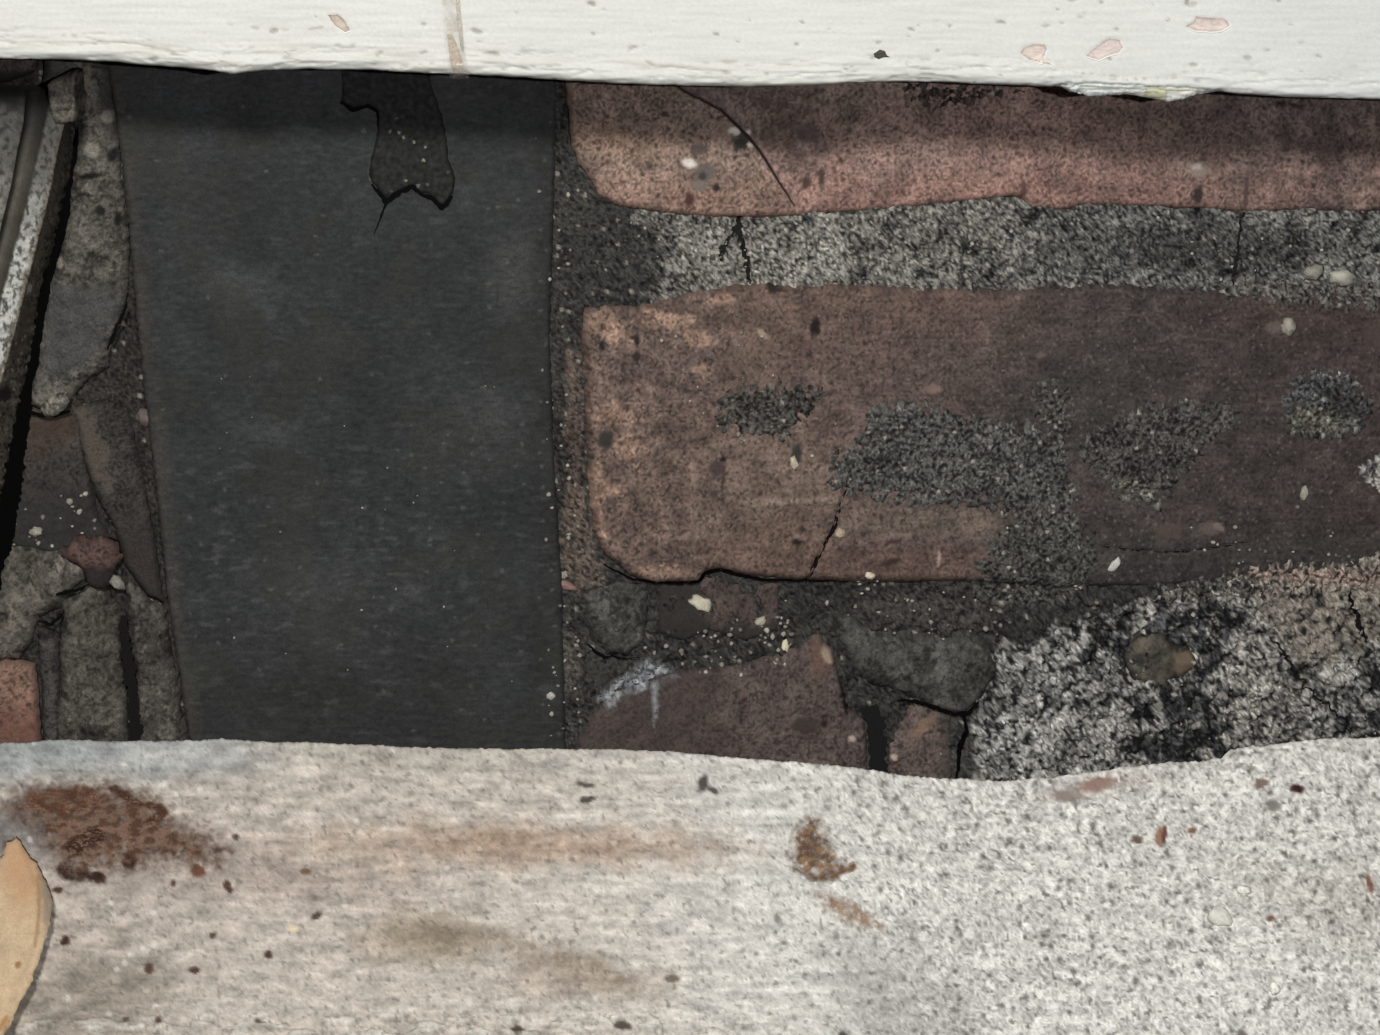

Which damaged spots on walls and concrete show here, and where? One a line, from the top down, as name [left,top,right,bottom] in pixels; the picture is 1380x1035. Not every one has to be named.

spalling [340,69,455,234]
crack [718,216,752,284]
crack [604,481,849,585]
corrosion [4,781,233,881]
corrosion [794,817,869,925]